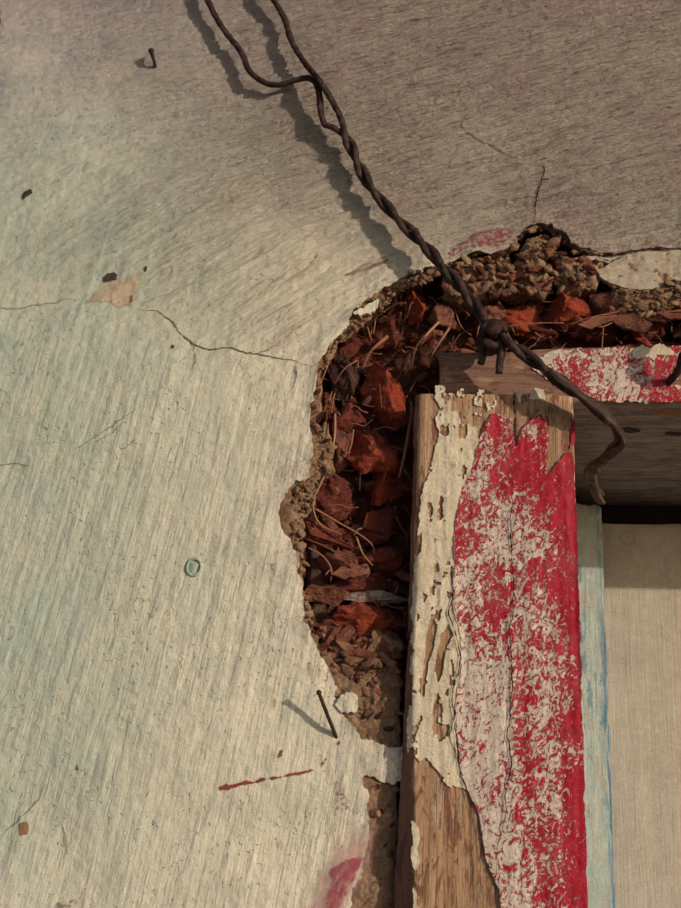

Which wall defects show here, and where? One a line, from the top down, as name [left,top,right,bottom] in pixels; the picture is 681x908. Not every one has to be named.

crack [461,107,547,219]
peeling [86,265,147,307]
crack [140,285,312,388]
crack [597,246,681,261]
spalling [278,224,681,748]
spalling [350,775,401,908]